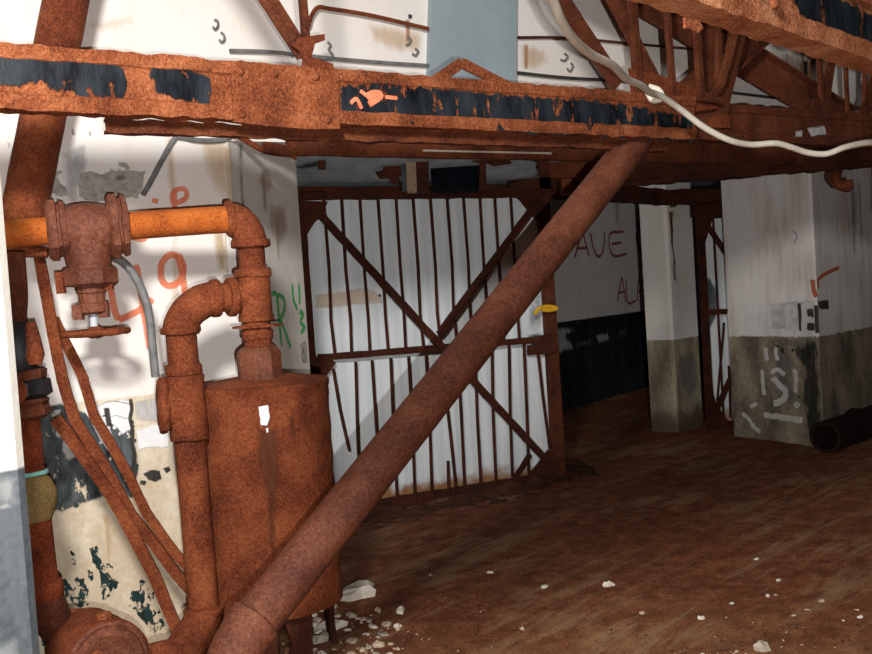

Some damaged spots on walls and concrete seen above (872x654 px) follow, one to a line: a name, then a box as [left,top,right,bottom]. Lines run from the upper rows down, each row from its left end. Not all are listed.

rust [262,141,294,158]
spalling [79,162,145,201]
peeling [40,404,103,511]
peeling [79,398,170,498]
peeling [63,546,119,608]
peeling [129,579,164,633]